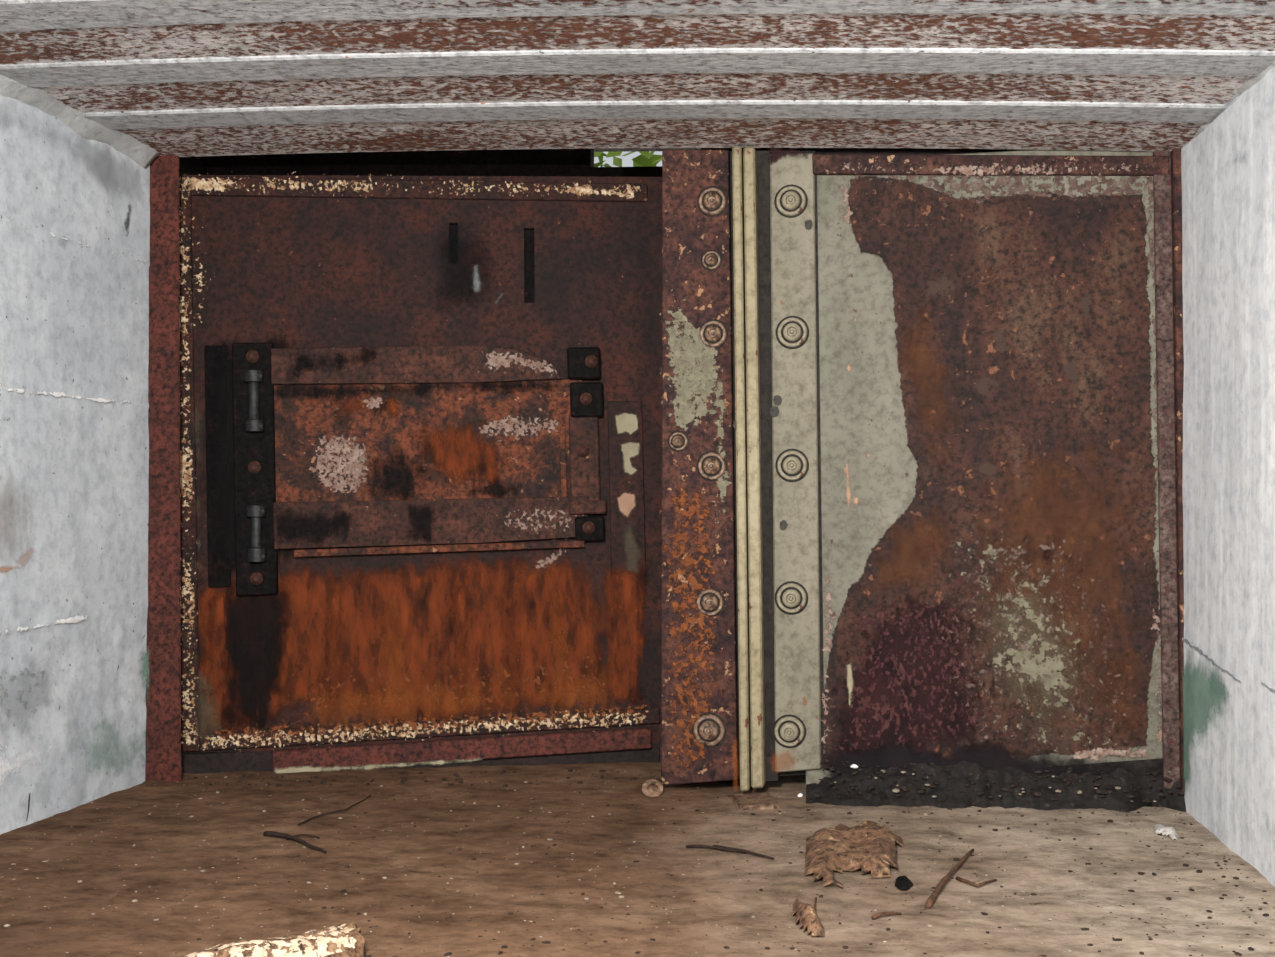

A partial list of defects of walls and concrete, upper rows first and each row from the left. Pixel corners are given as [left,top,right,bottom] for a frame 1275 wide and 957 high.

rust [0,0,1275,64]
rust [44,73,1235,112]
rust [119,118,1200,164]
rust [838,185,854,223]
peeling [659,299,732,531]
peeling [821,157,1162,771]
rust [198,487,723,772]
rust [832,580,995,754]